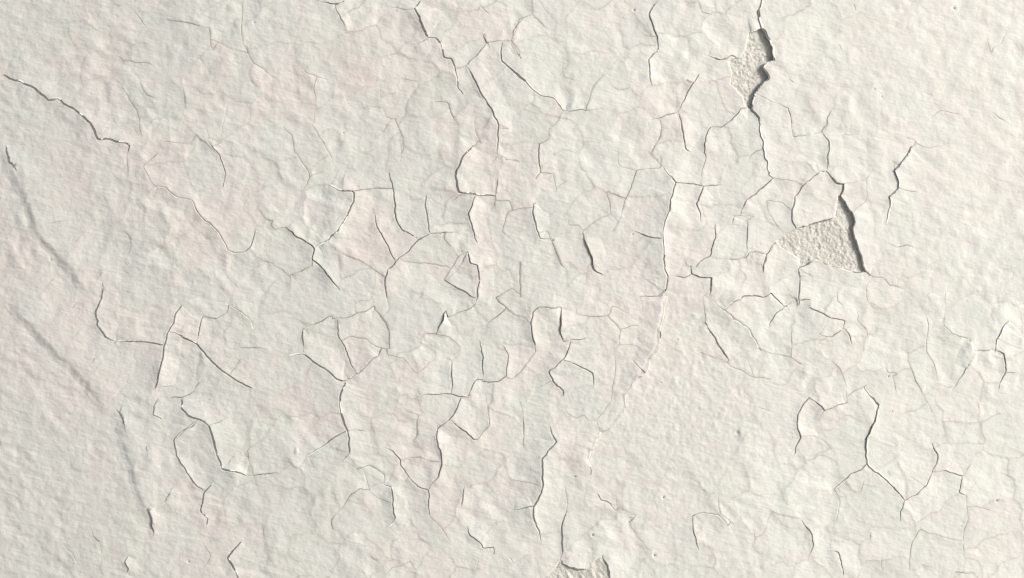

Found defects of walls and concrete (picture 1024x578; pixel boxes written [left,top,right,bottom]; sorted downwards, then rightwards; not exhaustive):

crack [115,54,535,445]
crack [318,0,354,25]
crack [430,6,535,154]
crack [495,4,749,283]
peeling [709,0,809,178]
crack [696,99,870,269]
peeling [514,146,931,578]
crack [702,271,900,379]
crack [148,421,221,536]
crack [430,486,513,563]
crack [692,465,882,575]
crack [900,437,989,572]